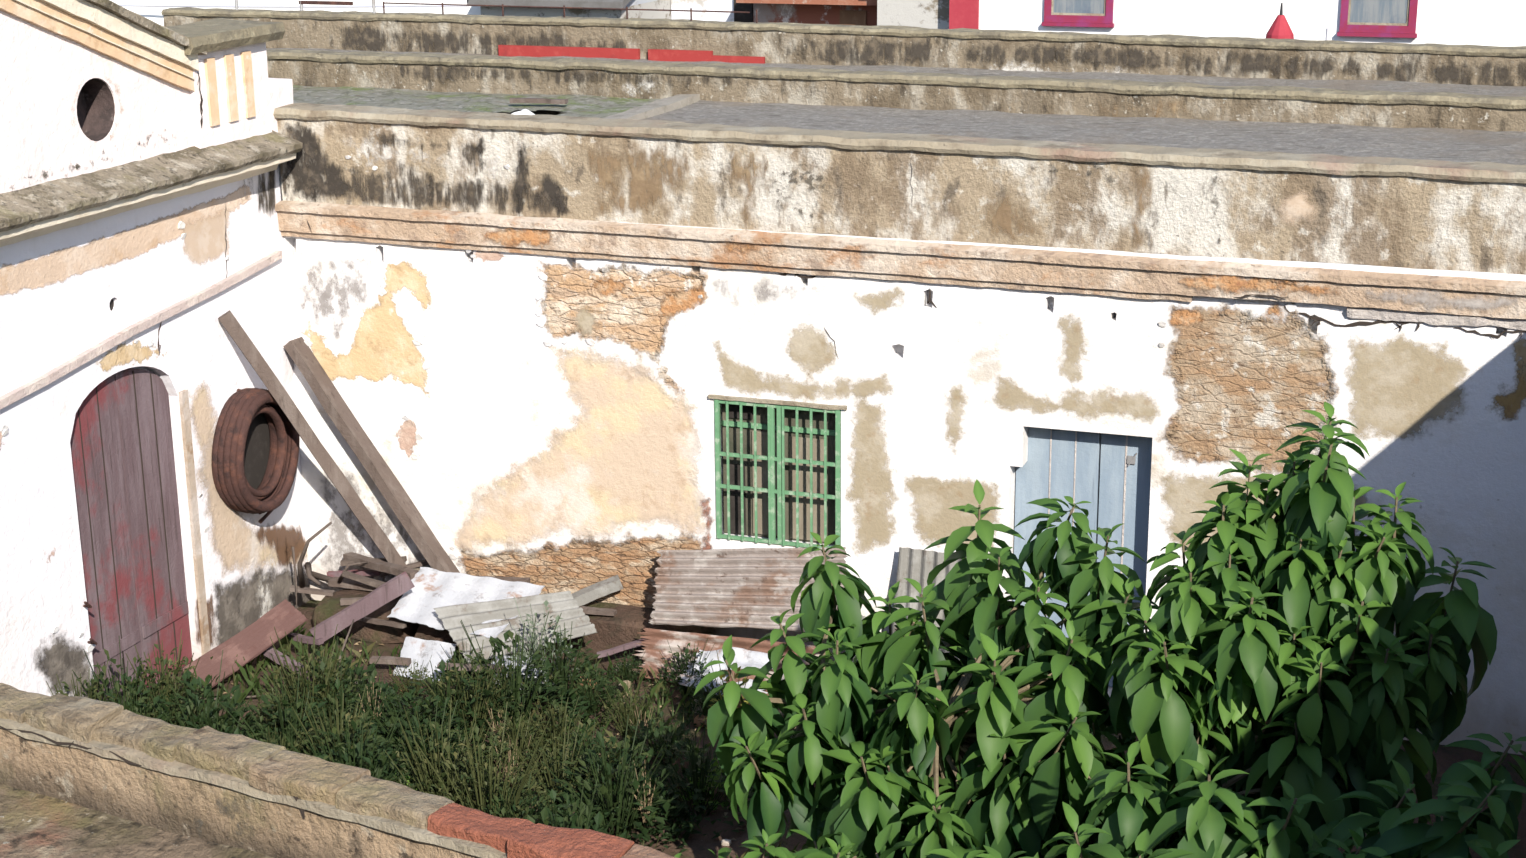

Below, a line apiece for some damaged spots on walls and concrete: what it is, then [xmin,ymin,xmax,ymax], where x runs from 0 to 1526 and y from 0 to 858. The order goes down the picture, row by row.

leakage [342,25,730,94]
leakage [806,37,932,66]
leakage [967,44,1526,86]
leakage [244,122,567,216]
flaking render [466,228,551,261]
peeling [299,261,431,394]
flaking render [396,415,423,460]
peeling [449,263,712,608]
flaking render [994,274,1467,551]
flaking render [36,626,96,698]